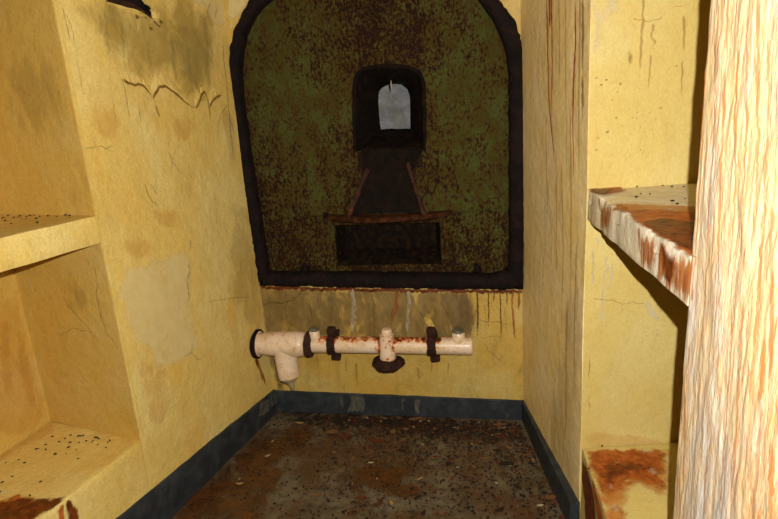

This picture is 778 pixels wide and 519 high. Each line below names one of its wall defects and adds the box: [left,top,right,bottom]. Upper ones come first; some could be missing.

spalling [106,0,162,30]
corrosion [589,187,696,299]
corrosion [261,286,523,336]
corrosion [0,494,79,519]
corrosion [582,449,667,519]